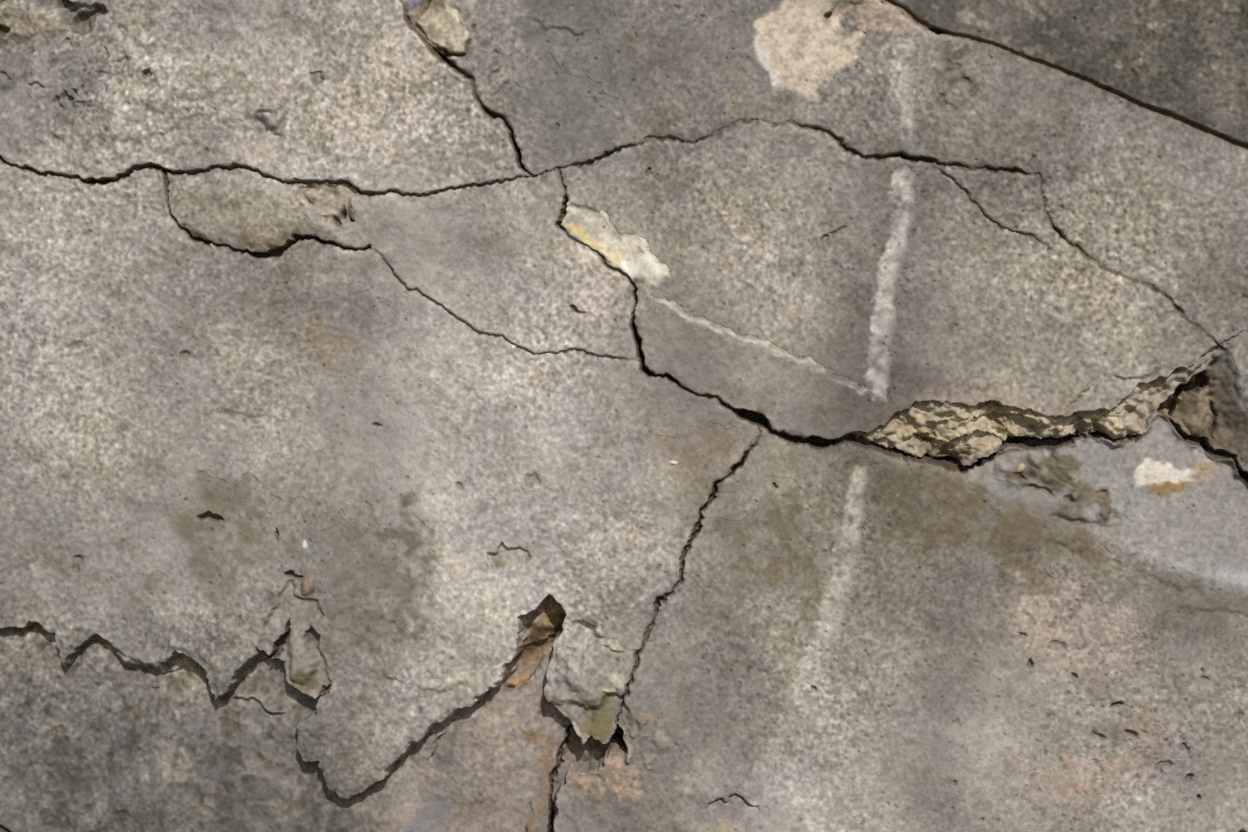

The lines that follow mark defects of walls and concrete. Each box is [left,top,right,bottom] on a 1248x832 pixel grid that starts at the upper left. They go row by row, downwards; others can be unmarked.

crack [0,0,645,366]
spalling [405,0,432,34]
crack [879,0,1248,152]
crack [556,117,1248,724]
spalling [851,345,1248,599]
crack [0,824,14,832]
peeling [0,579,627,832]
crack [525,723,574,832]